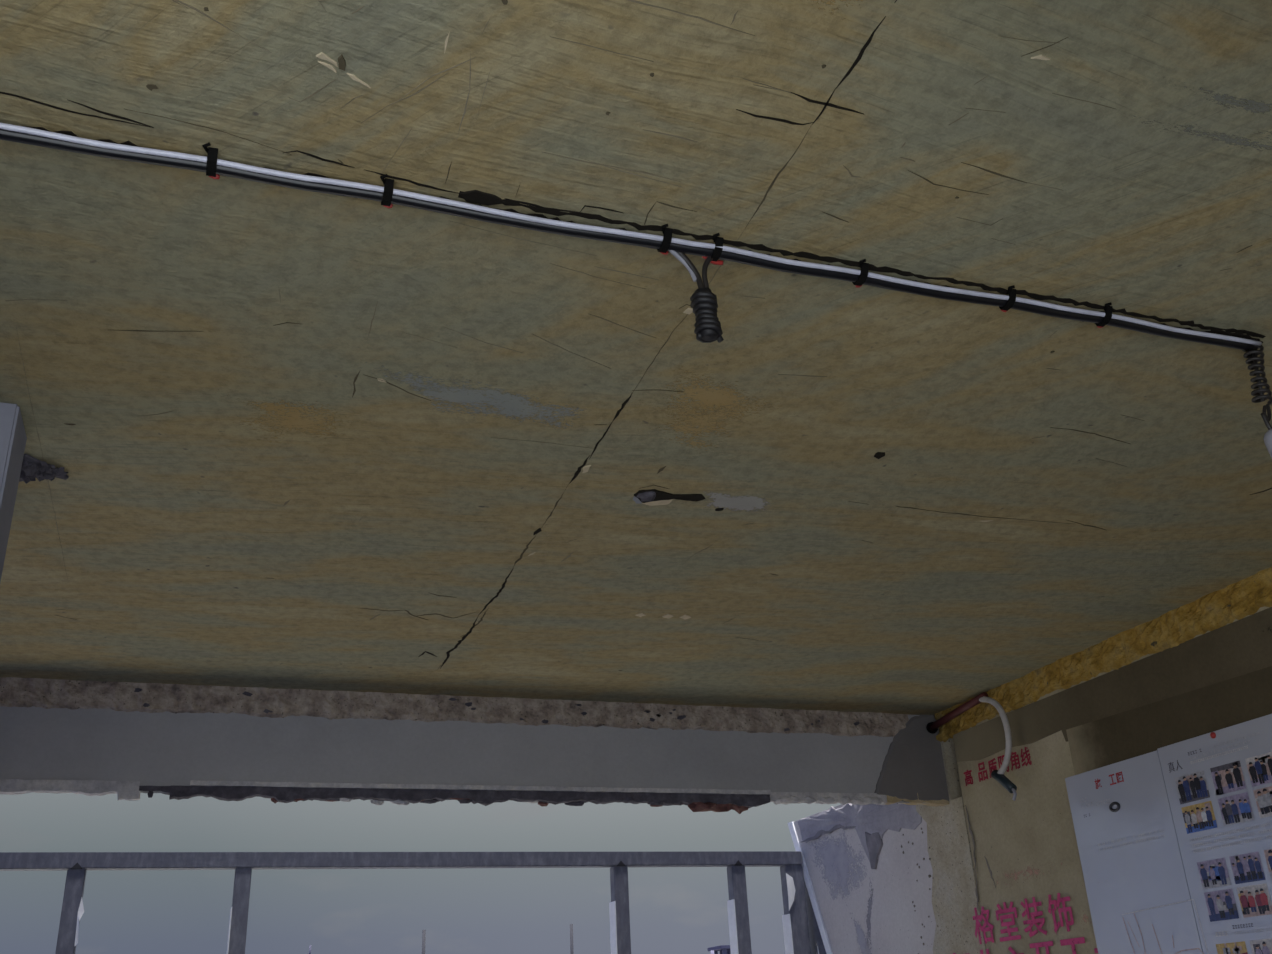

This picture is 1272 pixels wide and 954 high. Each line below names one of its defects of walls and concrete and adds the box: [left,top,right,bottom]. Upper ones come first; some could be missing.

crack [709,0,897,284]
crack [908,162,1027,225]
spalling [19,454,69,484]
crack [352,314,688,669]
spalling [0,677,909,737]